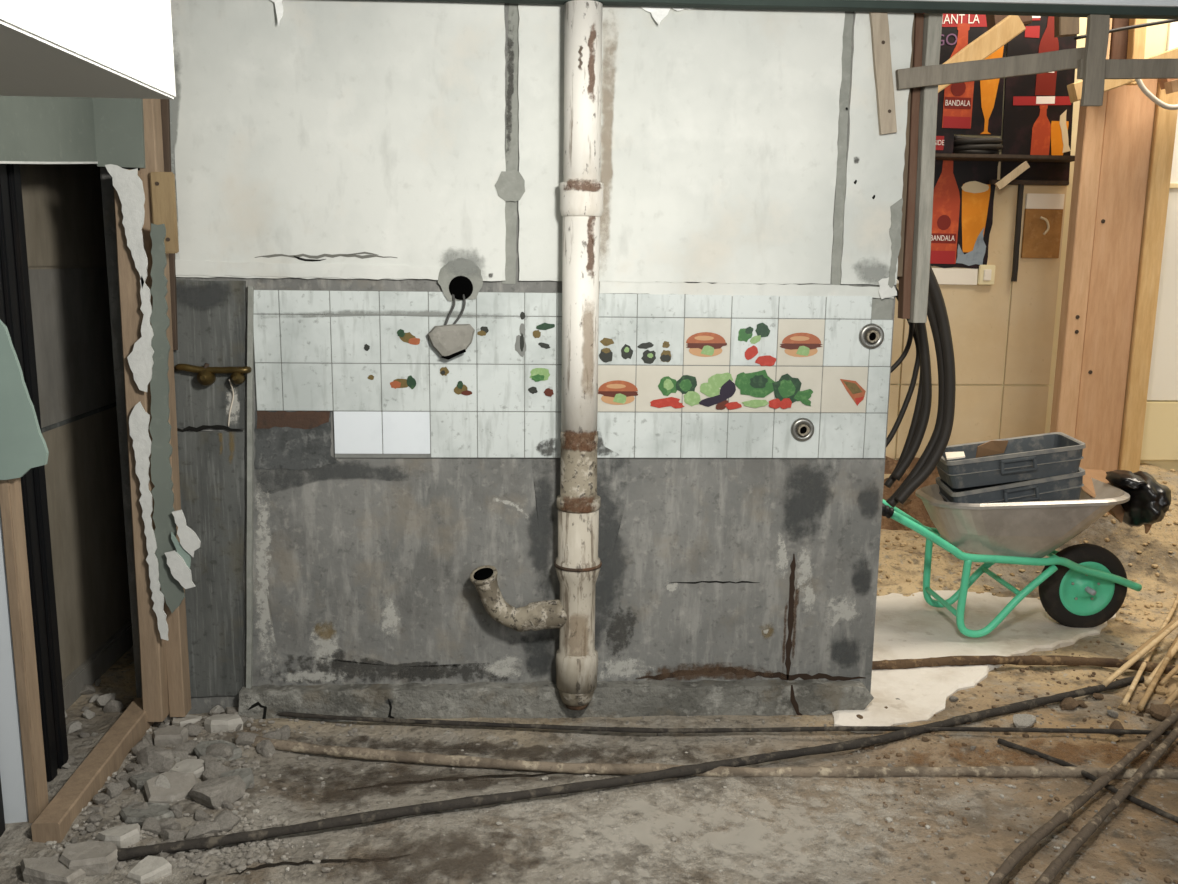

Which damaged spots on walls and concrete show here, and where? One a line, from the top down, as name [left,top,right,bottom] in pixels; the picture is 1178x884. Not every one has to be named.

rust [578,25,596,99]
crack [255,252,397,261]
peeling [105,164,201,641]
rust [562,430,597,452]
rust [561,497,594,513]
damp [776,468,870,626]
crack [667,581,760,591]
crack [783,554,802,715]
damp [832,641,858,666]
crack [203,854,411,884]